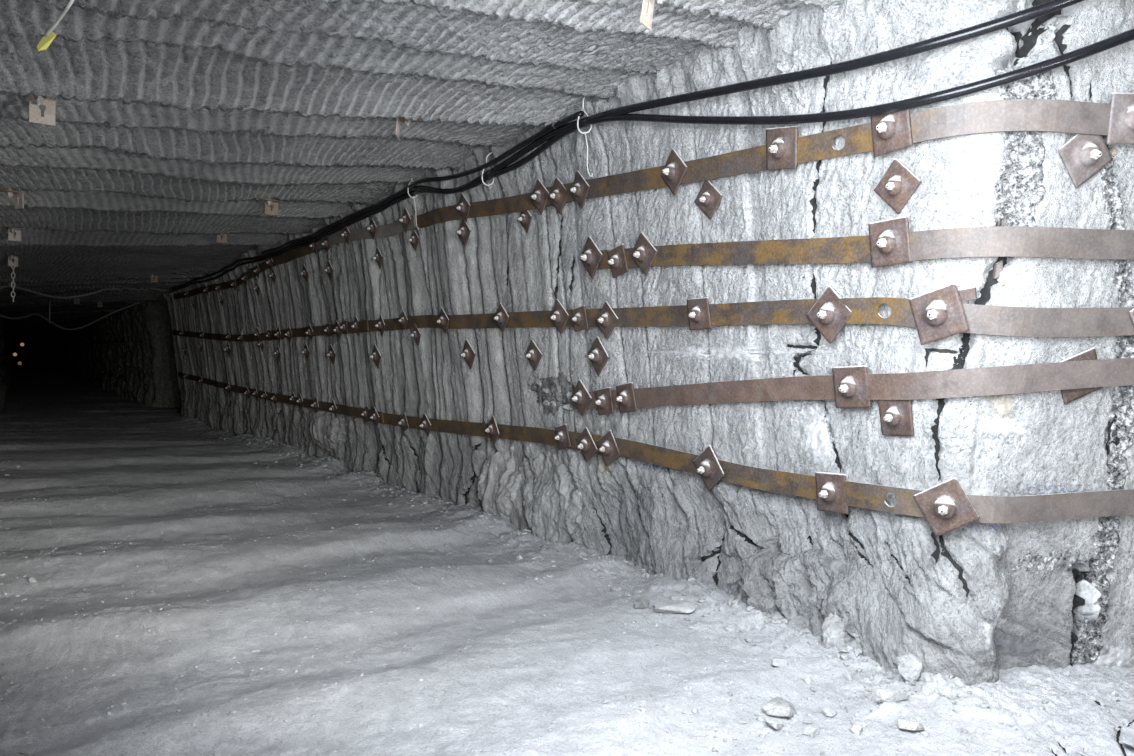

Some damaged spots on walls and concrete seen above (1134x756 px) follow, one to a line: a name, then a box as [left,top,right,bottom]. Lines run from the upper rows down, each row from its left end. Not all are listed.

crack [820,61,832,132]
crack [809,160,821,233]
crack [809,267,817,299]
crack [974,257,1007,305]
crack [787,328,821,375]
crack [924,333,971,370]
crack [931,398,945,481]
crack [1106,414,1120,456]
crack [1070,568,1088,667]
crack [1095,700,1134,756]